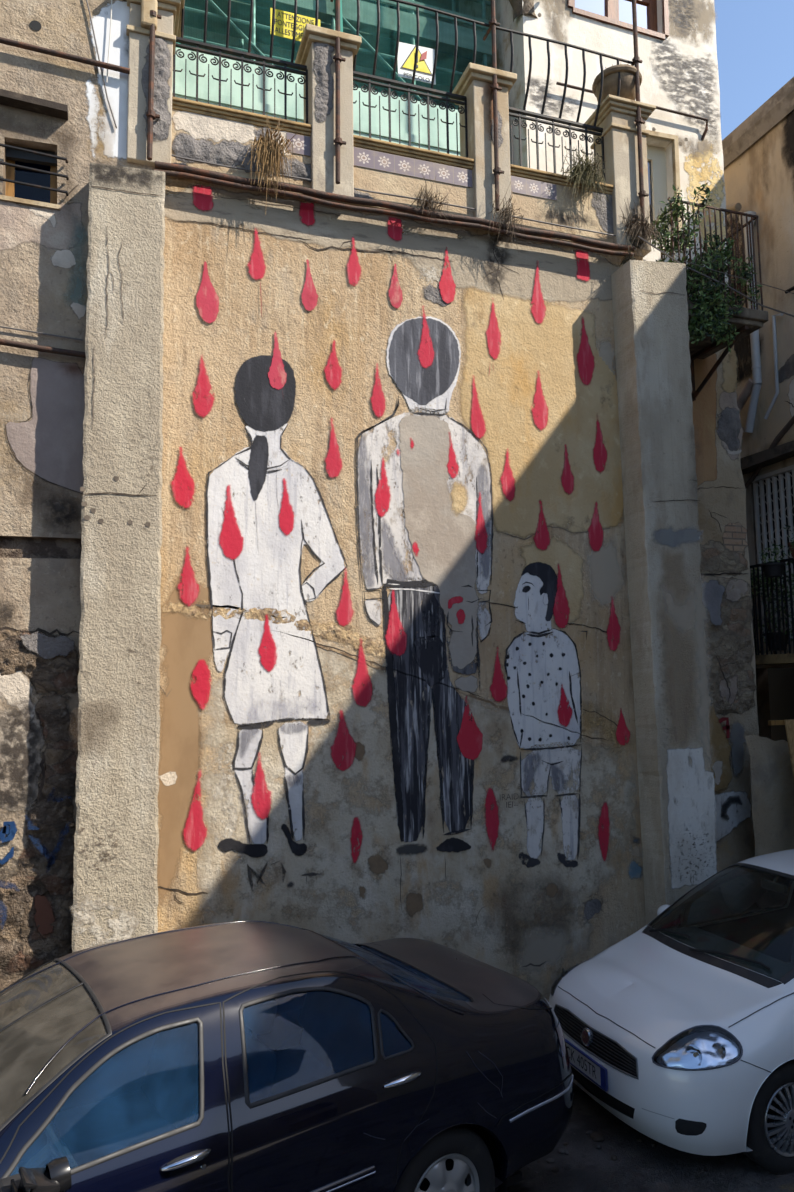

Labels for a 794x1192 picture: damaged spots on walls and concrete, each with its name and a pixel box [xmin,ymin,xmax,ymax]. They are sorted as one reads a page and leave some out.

peeling [86,80,100,156]
damp [678,112,716,156]
damp [782,109,794,178]
crack [65,184,445,260]
peeling [684,144,726,275]
crack [482,238,519,300]
crack [92,226,124,429]
spalling [778,354,794,417]
spalling [700,540,756,716]
spalling [0,629,138,991]